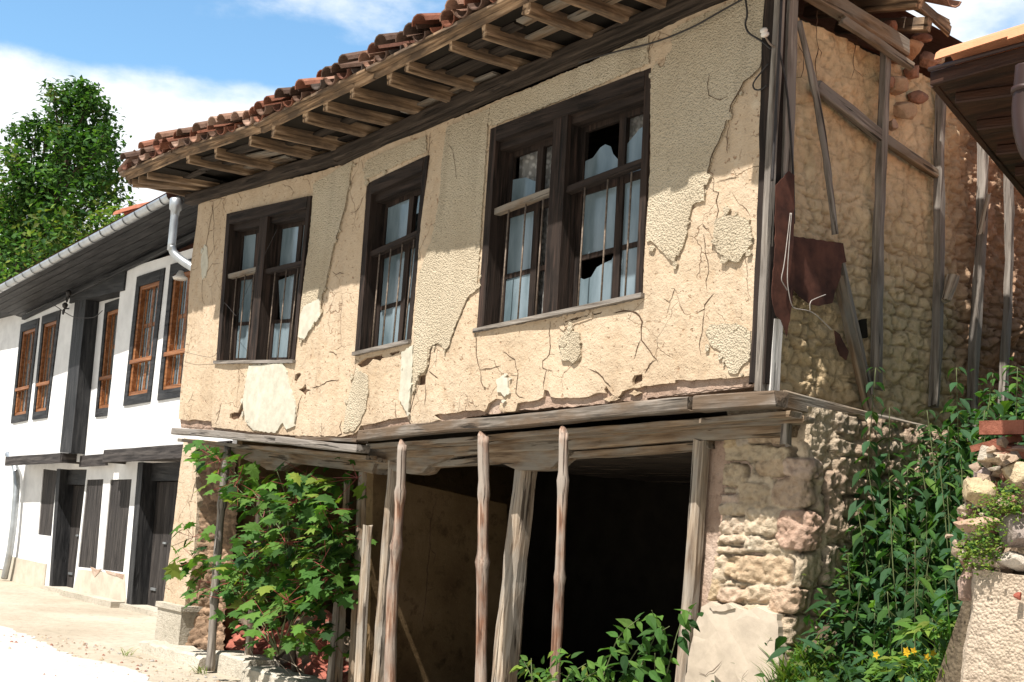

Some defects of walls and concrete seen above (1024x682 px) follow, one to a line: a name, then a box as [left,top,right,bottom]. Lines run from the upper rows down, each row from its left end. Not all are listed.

peeling [232,363,311,433]
peeling [298,136,427,344]
peeling [343,0,764,433]
crack [615,310,657,372]
crack [699,63,762,354]